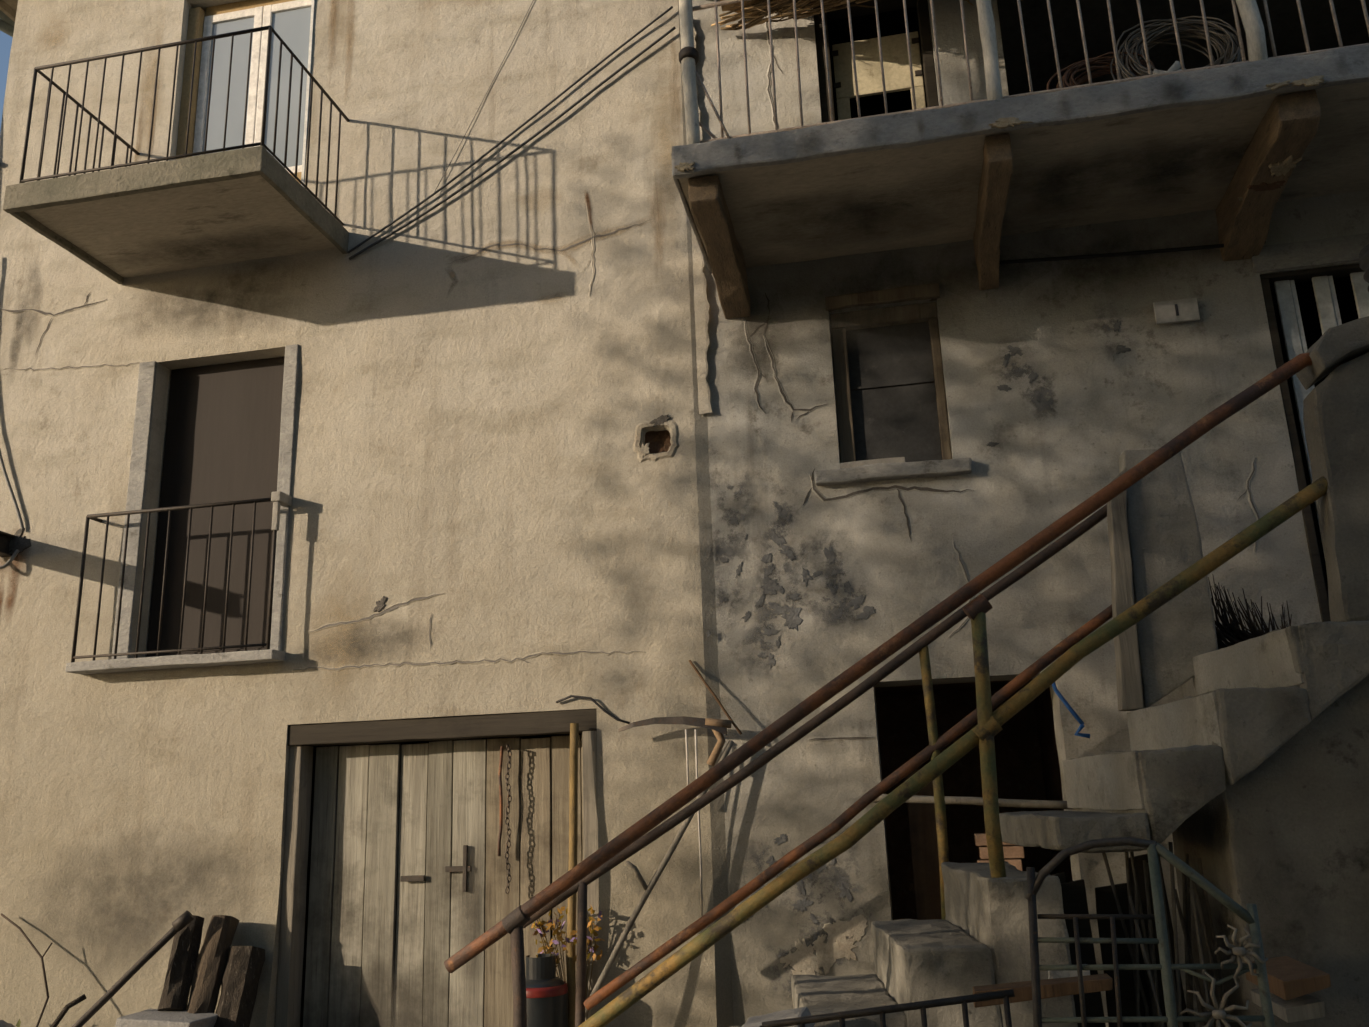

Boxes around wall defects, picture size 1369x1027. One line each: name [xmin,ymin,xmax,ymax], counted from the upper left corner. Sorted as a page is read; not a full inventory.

crack [450,193,654,296]
crack [742,293,827,422]
spalling [633,414,680,463]
crack [803,469,974,542]